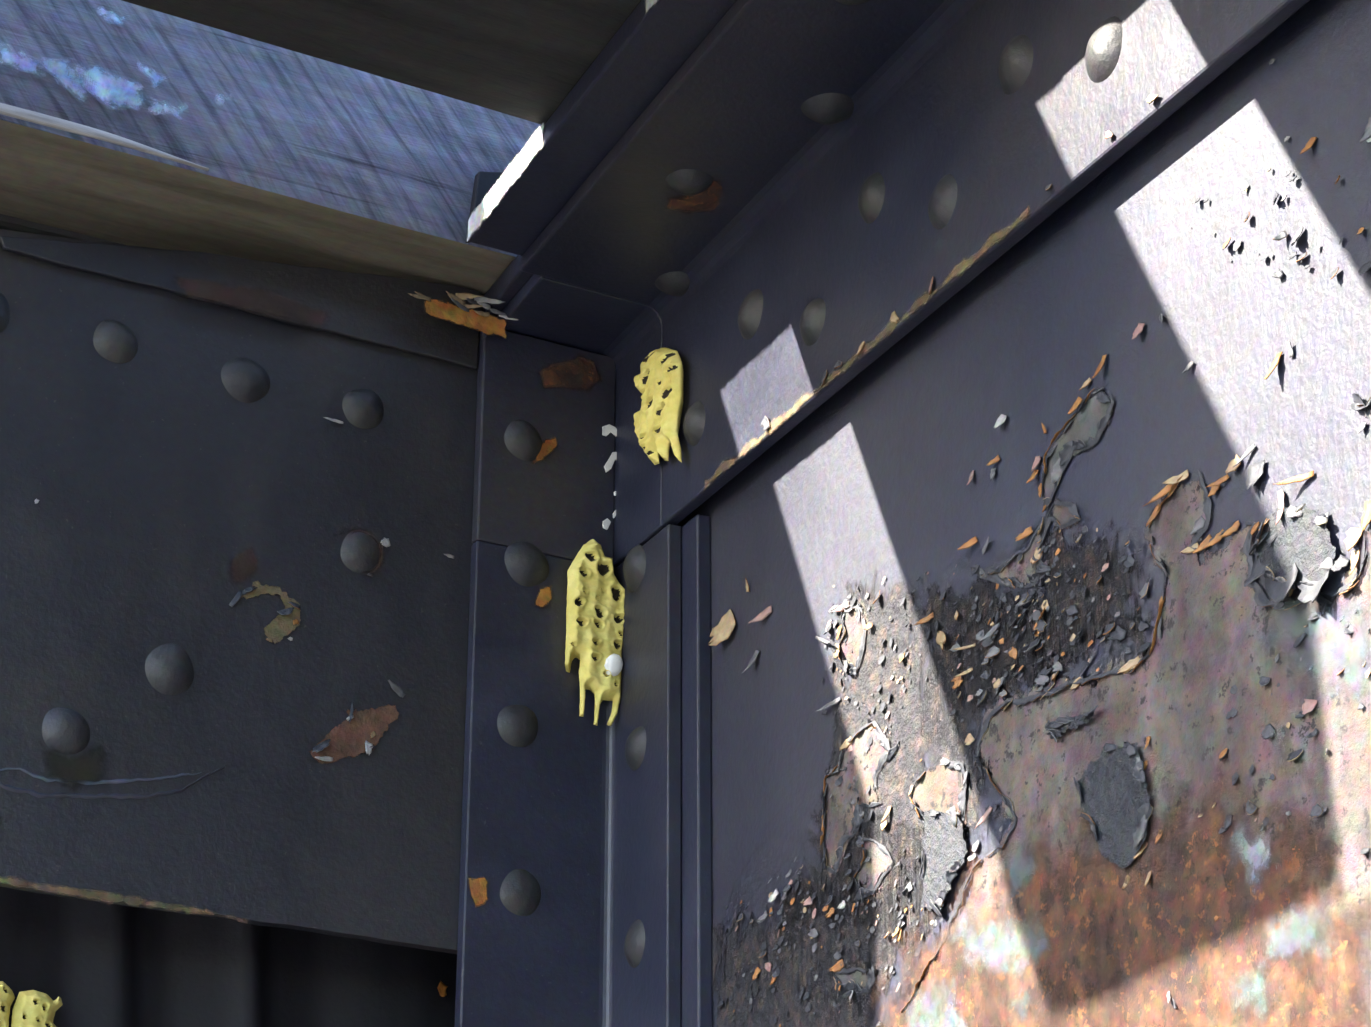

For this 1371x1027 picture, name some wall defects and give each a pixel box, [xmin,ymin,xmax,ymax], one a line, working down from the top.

leakage [1,49,181,114]
peeling [1300,137,1317,154]
peeling [1359,117,1371,143]
corrosion [408,291,519,338]
peeling [1132,314,1163,339]
peeling [1264,340,1294,380]
peeling [229,581,301,644]
peeling [708,354,1371,1027]
crack [0,766,225,799]
corrosion [885,777,1366,1027]